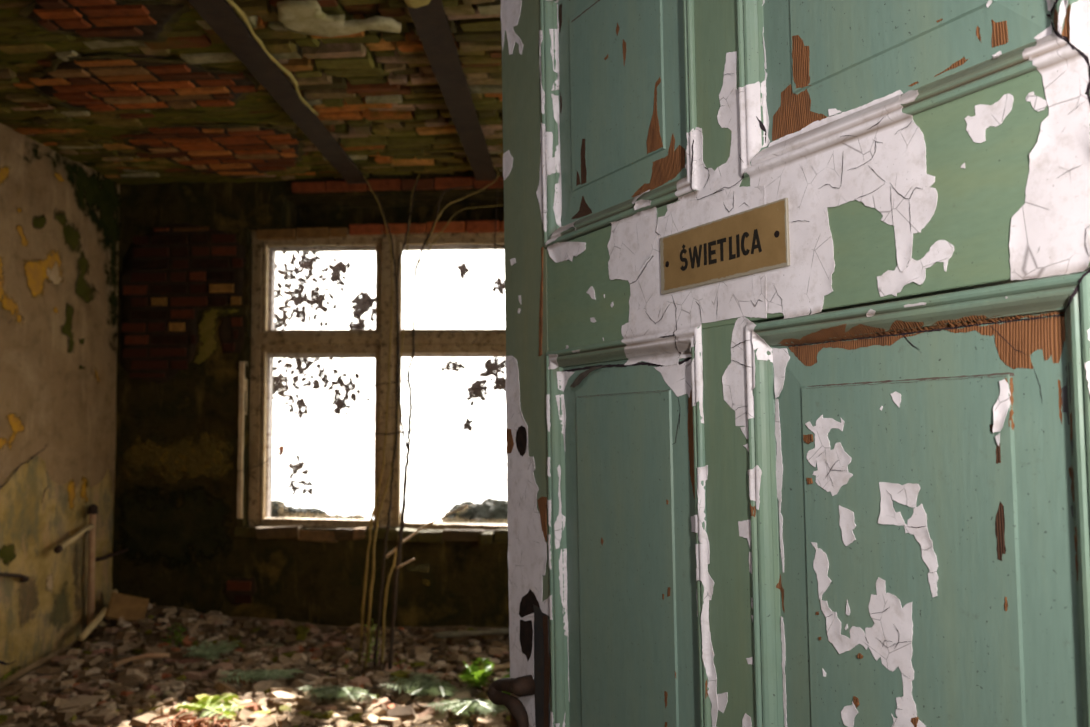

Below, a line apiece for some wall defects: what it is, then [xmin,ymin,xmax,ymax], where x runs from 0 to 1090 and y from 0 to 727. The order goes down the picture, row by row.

spalling [19,0,261,112]
peeling [277,0,401,37]
crack [1047,0,1090,113]
spalling [122,124,306,179]
peeling [503,150,513,181]
peeling [536,0,607,450]
crack [818,115,921,228]
peeling [965,0,1090,281]
crack [788,226,1090,397]
peeling [607,28,1078,727]
peeling [505,356,570,702]
peeling [510,693,536,727]